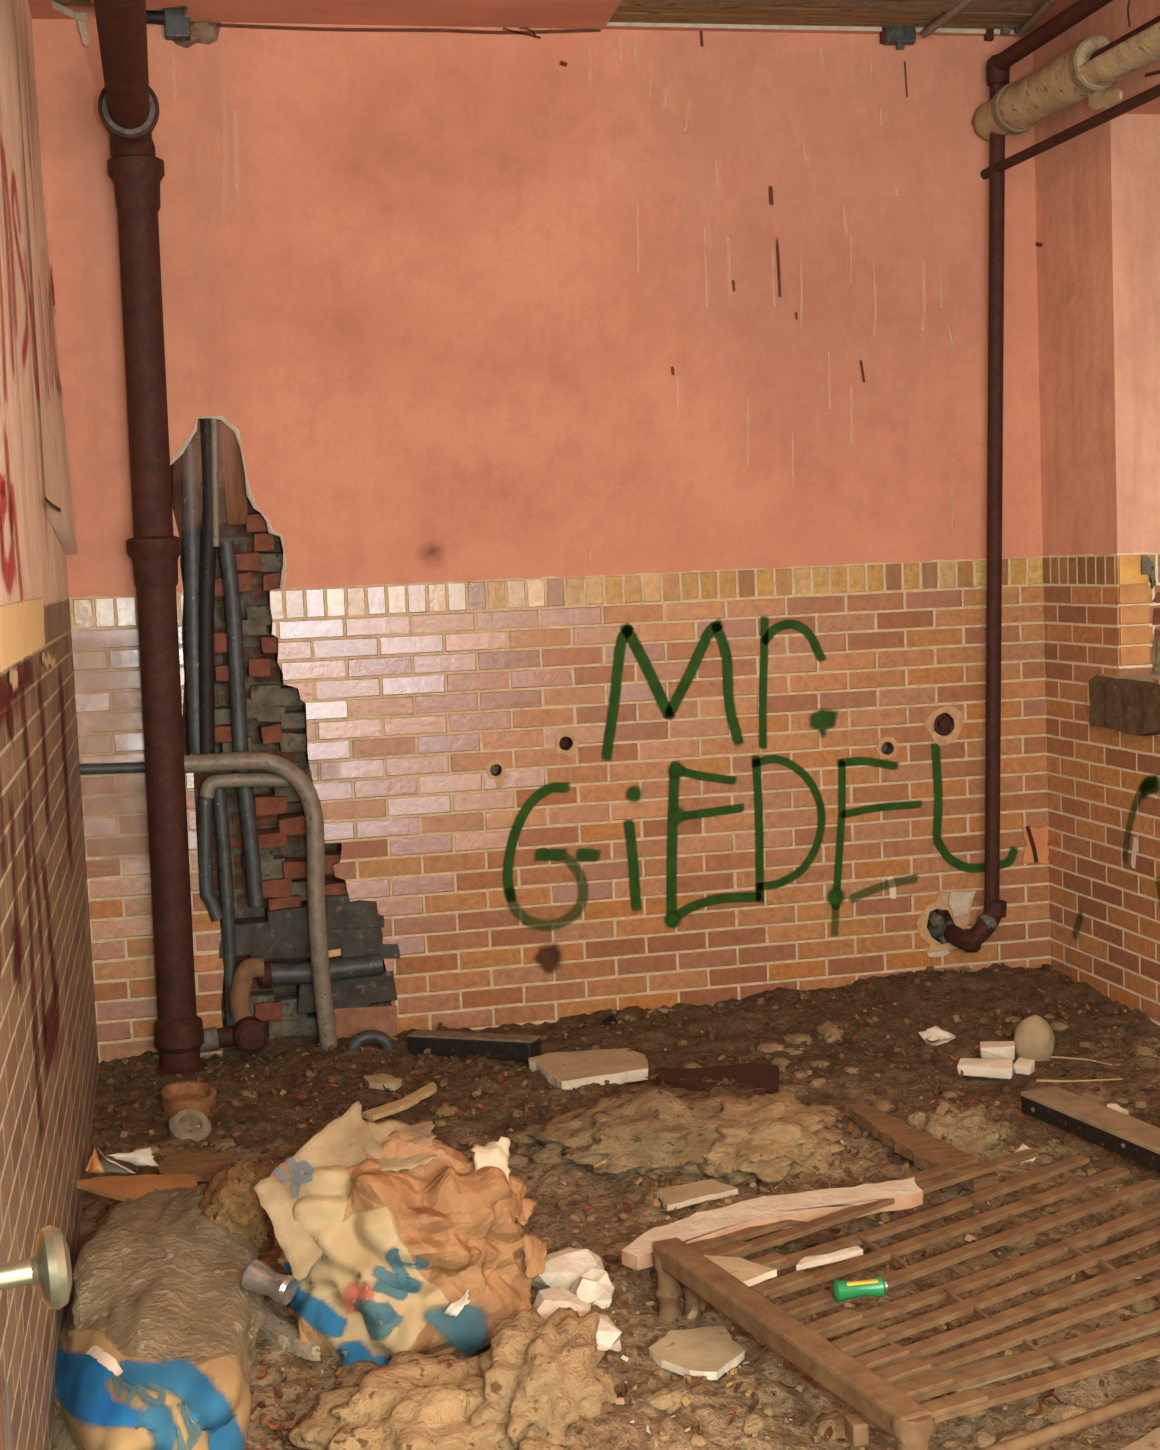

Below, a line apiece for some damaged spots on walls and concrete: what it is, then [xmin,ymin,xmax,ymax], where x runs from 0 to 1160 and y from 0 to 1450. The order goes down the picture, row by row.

flaking render [170,416,287,598]
flaking render [214,632,229,681]
flaking render [248,636,278,677]
flaking render [215,724,232,743]
flaking render [258,723,282,744]
flaking render [255,793,307,910]
flaking render [325,850,348,896]
flaking render [254,998,282,1021]
flaking render [334,1001,397,1039]